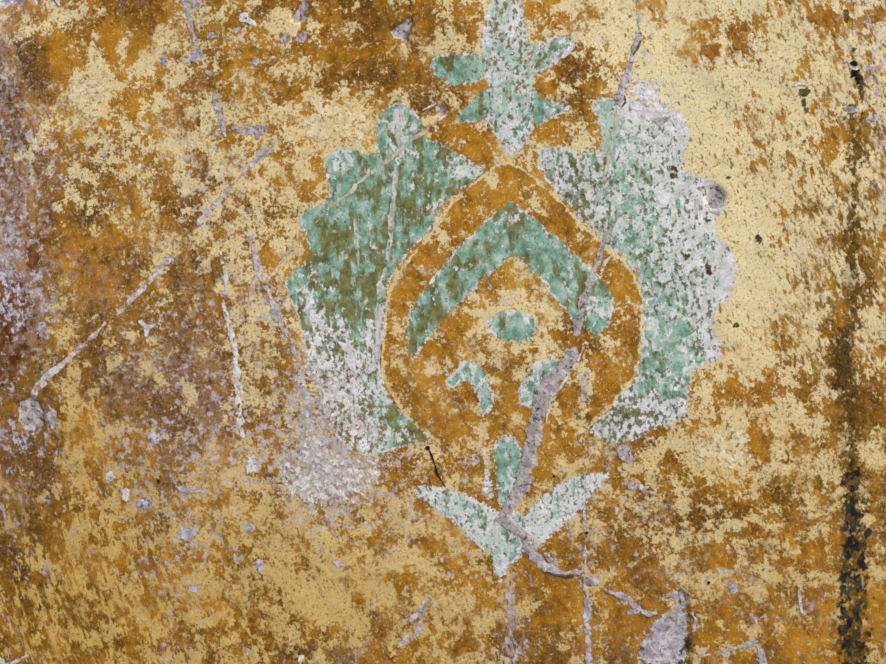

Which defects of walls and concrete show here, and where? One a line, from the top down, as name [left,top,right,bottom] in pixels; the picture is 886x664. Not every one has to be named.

water stain [825,48,877,664]
crack [521,456,657,664]
flaking render [637,590,698,664]